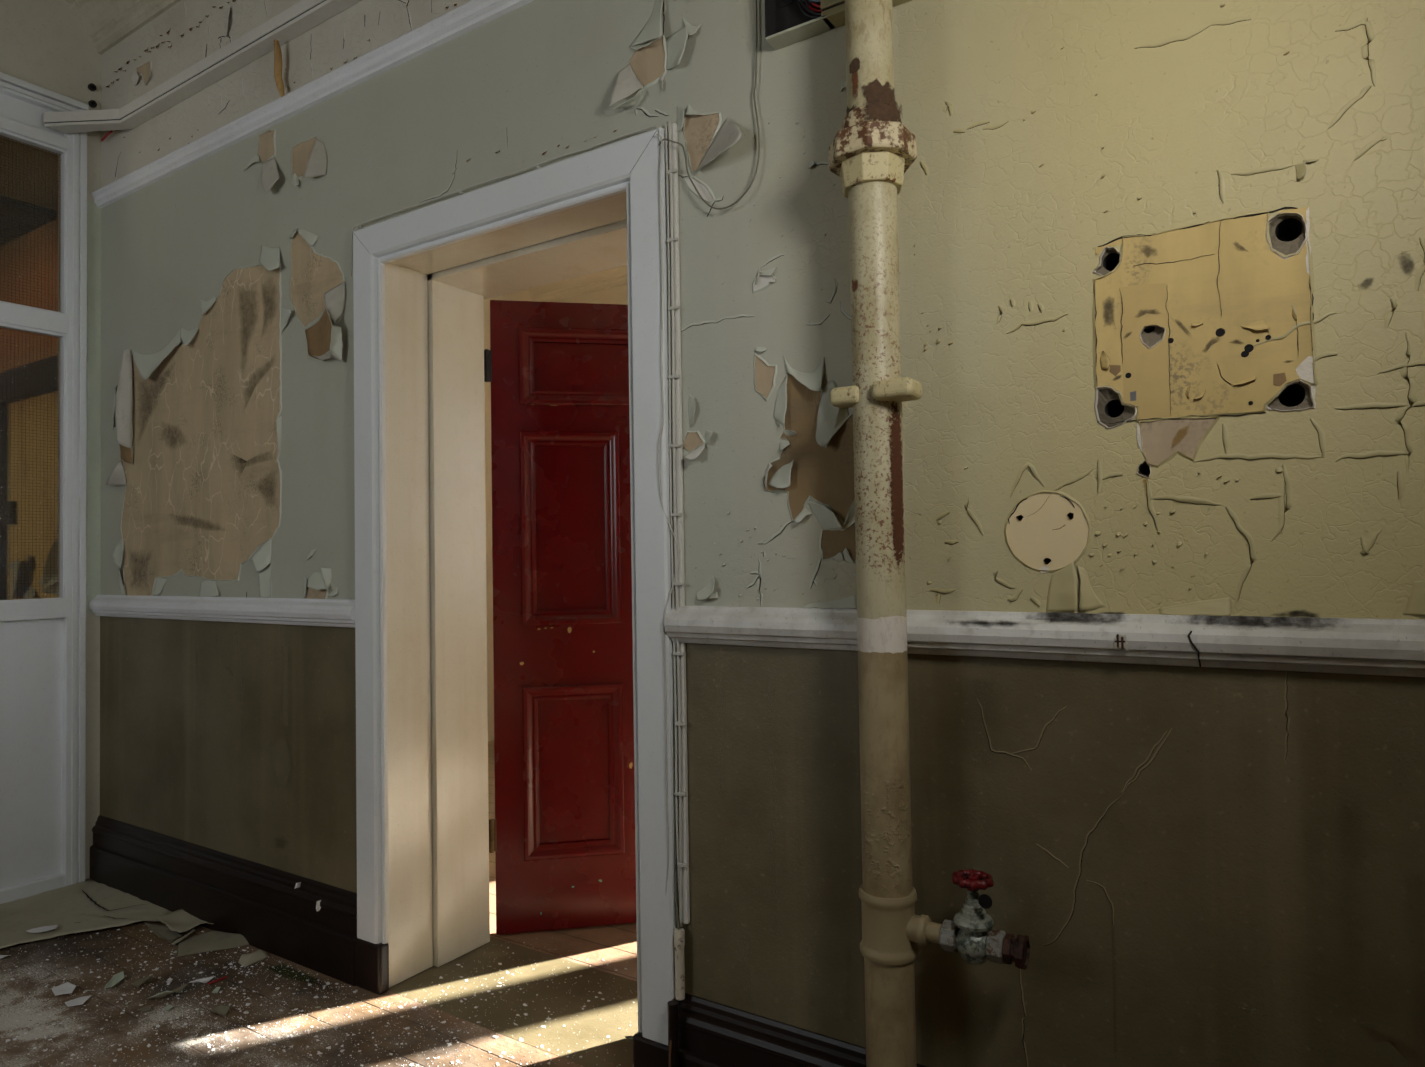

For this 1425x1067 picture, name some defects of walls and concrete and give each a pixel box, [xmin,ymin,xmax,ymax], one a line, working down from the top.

crack [1134,17,1251,49]
corrosion [847,58,902,124]
crack [1327,18,1376,128]
crack [943,101,1009,133]
crack [1353,136,1384,161]
hole [1265,212,1308,260]
spalling [1093,247,1122,277]
peeling [105,228,346,599]
hole [1094,386,1137,430]
crack [936,164,1425,607]
spalling [1266,380,1316,412]
peeling [753,347,856,564]